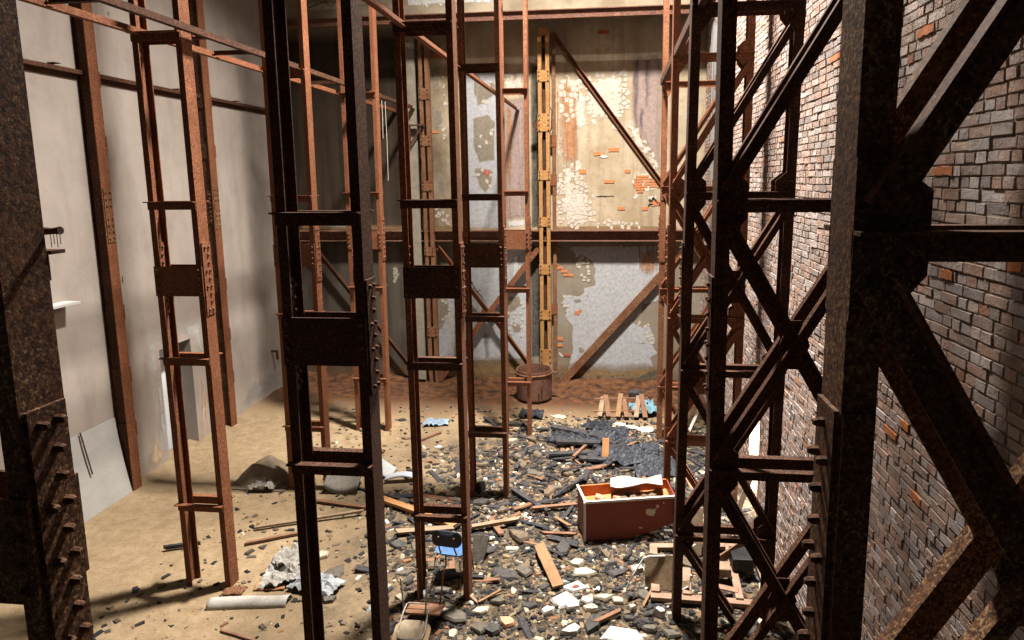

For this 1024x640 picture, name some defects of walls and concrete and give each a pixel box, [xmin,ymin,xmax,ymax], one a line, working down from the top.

peeling [466,72,524,228]
peeling [556,68,660,229]
peeling [557,246,659,371]